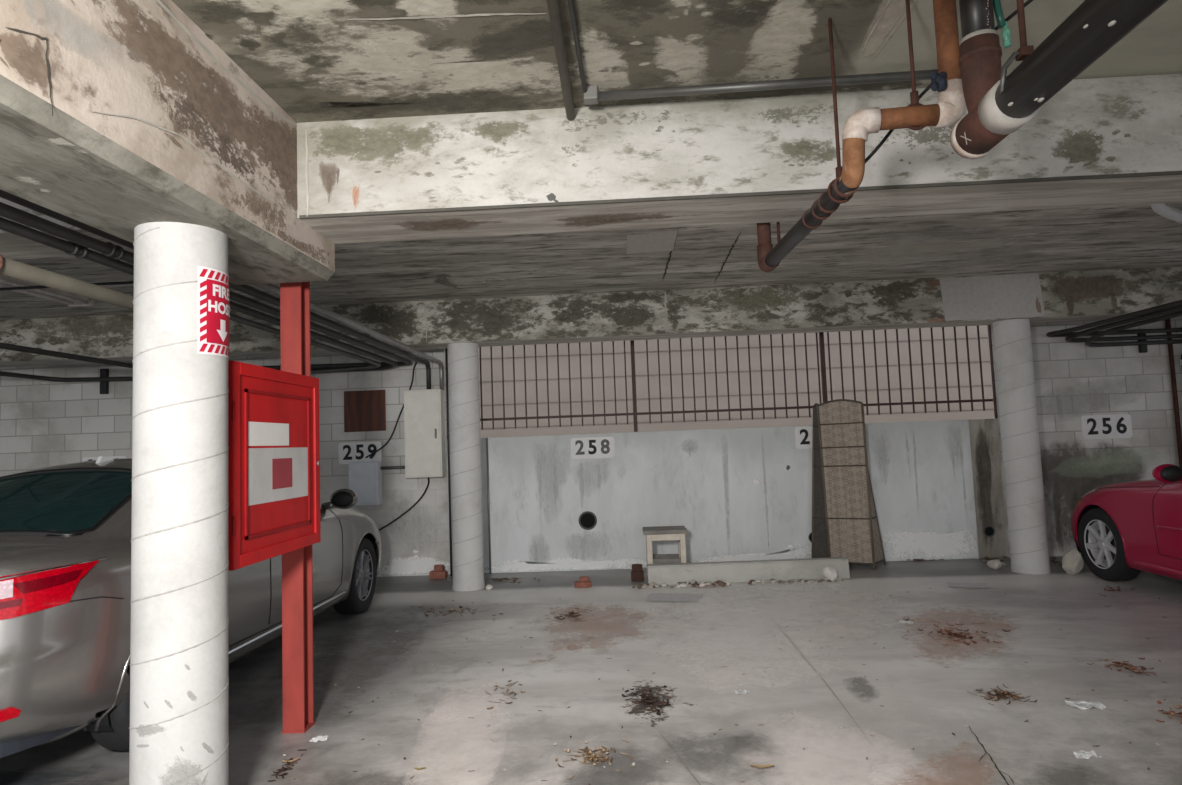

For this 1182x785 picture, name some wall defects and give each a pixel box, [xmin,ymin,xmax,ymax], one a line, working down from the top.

peeling [0,32,50,98]
crack [0,27,53,116]
damp [236,14,337,67]
damp [468,19,554,60]
damp [701,0,777,33]
peeling [92,0,329,264]
damp [304,79,931,201]
damp [882,124,955,164]
damp [356,273,681,341]
damp [1040,443,1144,549]
peeling [160,747,207,785]
crack [969,726,1014,785]